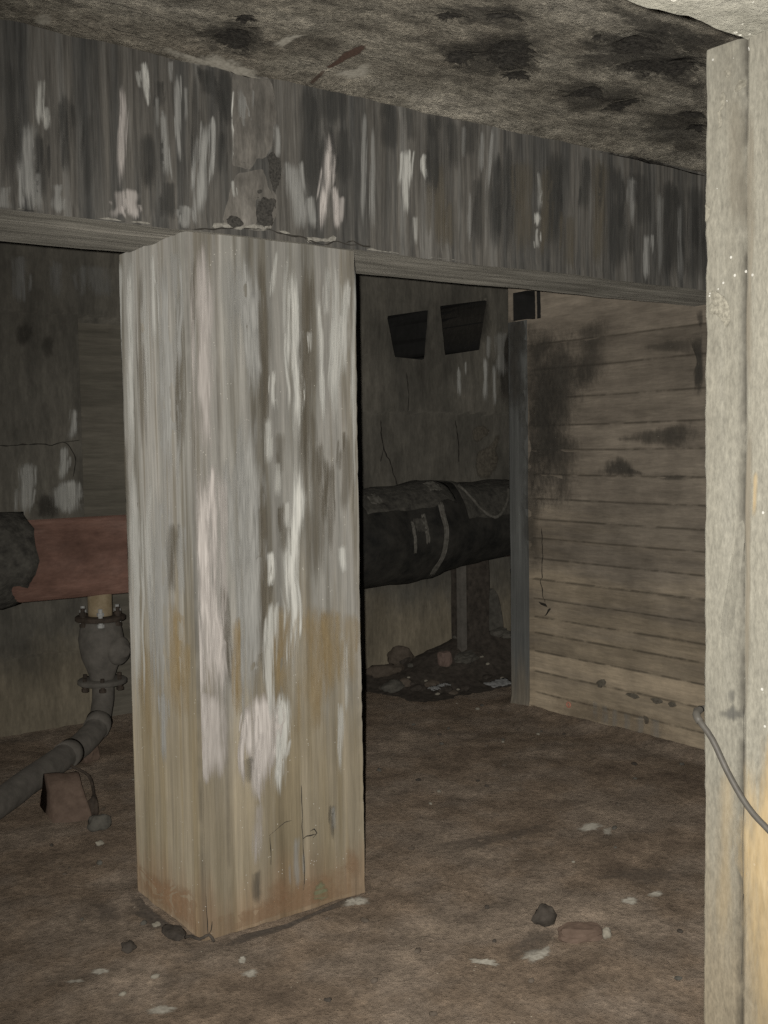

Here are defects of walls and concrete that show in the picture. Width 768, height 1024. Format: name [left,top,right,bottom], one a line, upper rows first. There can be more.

corrosion [311,45,364,83]
water stain [18,130,50,212]
water stain [118,93,128,173]
water stain [99,190,150,224]
water stain [144,48,255,226]
peeling [223,74,281,228]
water stain [483,321,576,491]
crack [0,440,79,476]
water stain [55,448,82,512]
water stain [197,256,349,797]
crack [539,528,551,616]
water stain [232,897,366,944]